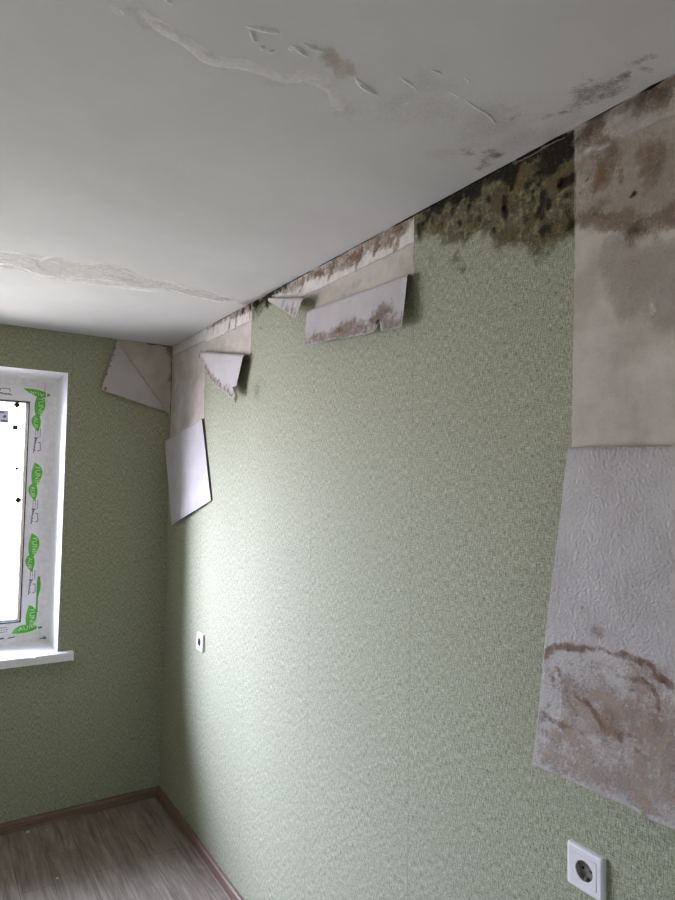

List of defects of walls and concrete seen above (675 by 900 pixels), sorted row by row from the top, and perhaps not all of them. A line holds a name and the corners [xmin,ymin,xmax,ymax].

flaking render [271,216,414,308]
water stain [212,75,675,331]
flaking render [114,304,252,438]
water stain [544,643,594,658]
water stain [537,651,675,815]